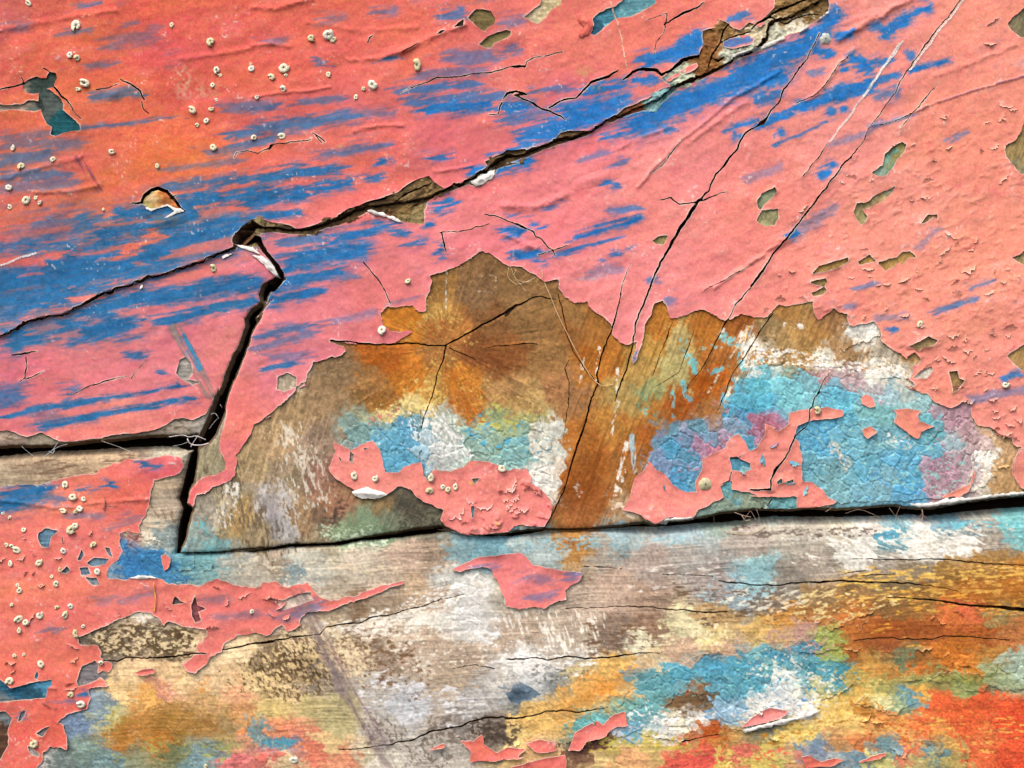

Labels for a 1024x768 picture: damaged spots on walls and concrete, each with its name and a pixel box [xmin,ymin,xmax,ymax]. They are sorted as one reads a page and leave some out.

peeling [0,72,80,136]
crack [653,0,961,388]
peeling [907,177,934,203]
crack [0,0,849,528]
peeling [0,248,1024,768]
crack [566,605,727,613]
crack [663,558,1024,611]
crack [462,652,659,669]
crack [339,708,603,750]